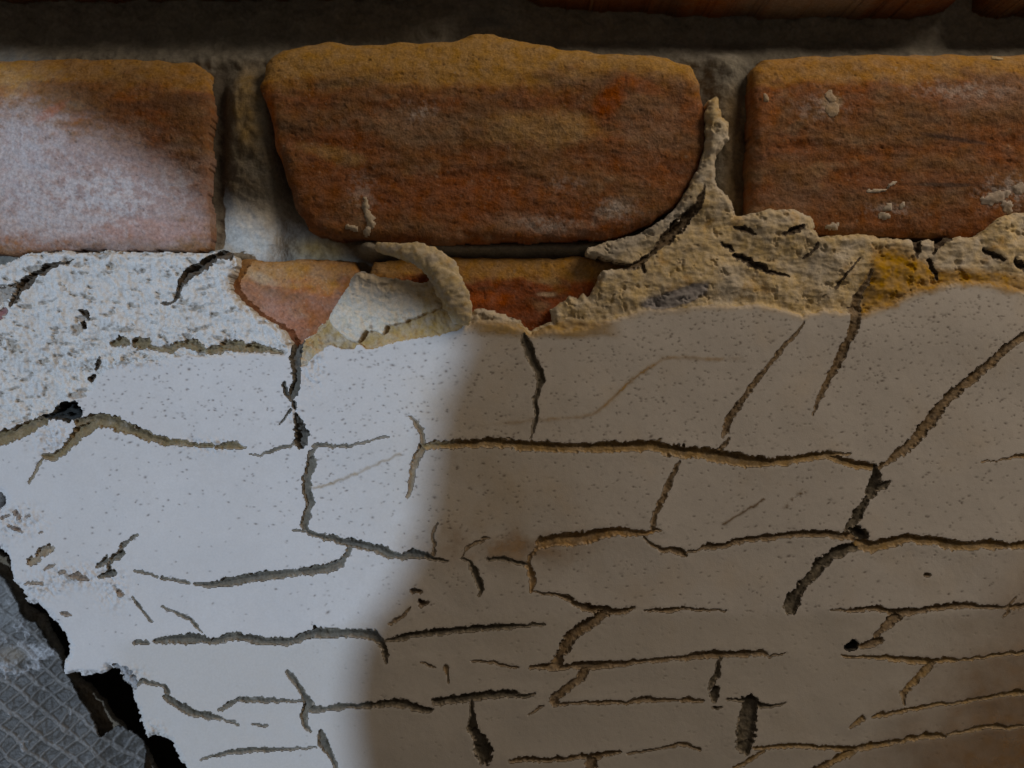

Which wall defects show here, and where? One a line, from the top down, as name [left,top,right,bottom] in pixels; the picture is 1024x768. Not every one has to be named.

crack [2,251,116,307]
crack [160,250,234,306]
peeling [0,97,1024,428]
crack [720,224,819,278]
crack [913,238,953,281]
crack [982,247,1024,272]
crack [812,257,874,416]
spalling [0,509,31,533]
spalling [23,531,90,586]
crack [0,322,1024,768]
spalling [112,663,138,690]